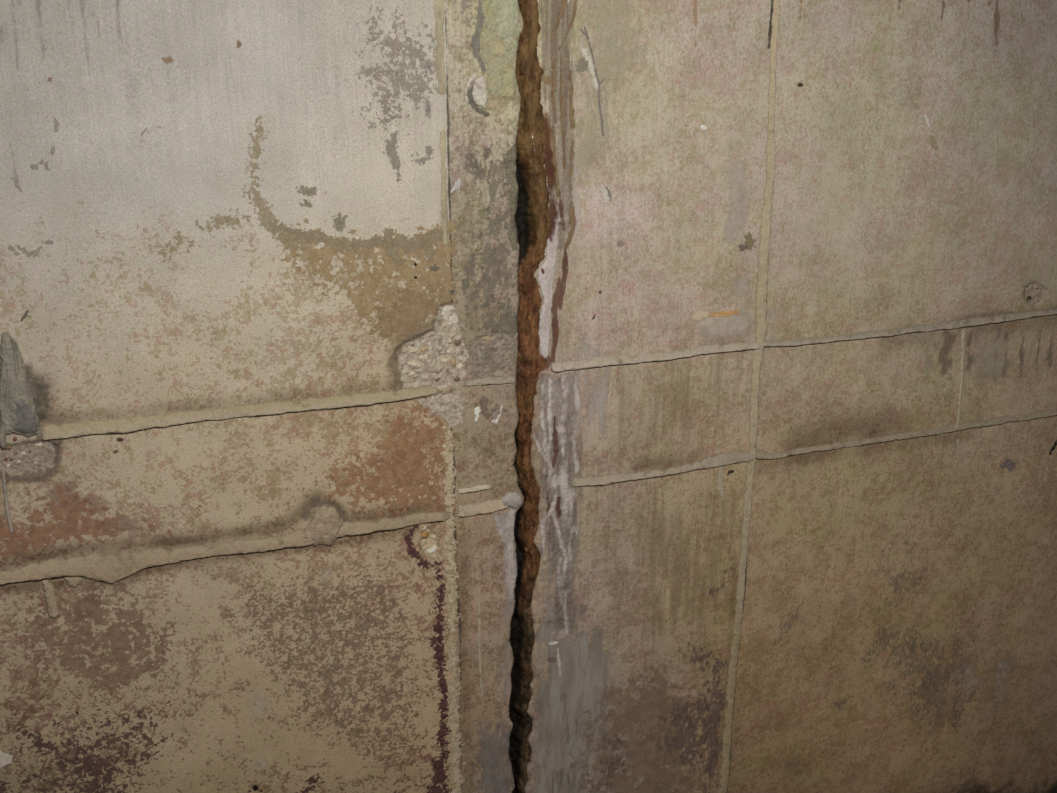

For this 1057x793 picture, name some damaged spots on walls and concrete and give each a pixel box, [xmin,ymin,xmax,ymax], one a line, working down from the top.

water stain [158,231,195,262]
water stain [196,116,518,346]
corrosion [541,0,577,368]
spalling [0,437,58,476]
spalling [390,304,518,431]
crack [509,0,550,793]
water stain [531,366,734,793]